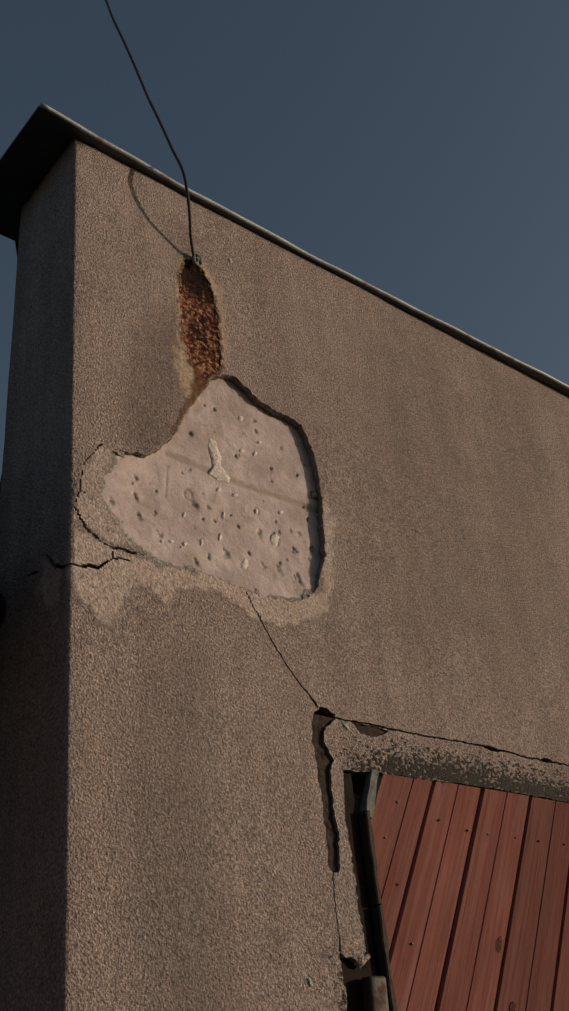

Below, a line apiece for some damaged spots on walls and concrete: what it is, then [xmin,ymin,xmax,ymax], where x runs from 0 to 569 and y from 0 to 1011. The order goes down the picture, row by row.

corrosion [172,255,227,436]
crack [55,549,117,570]
flaking render [34,379,339,628]
flaking render [311,713,569,873]